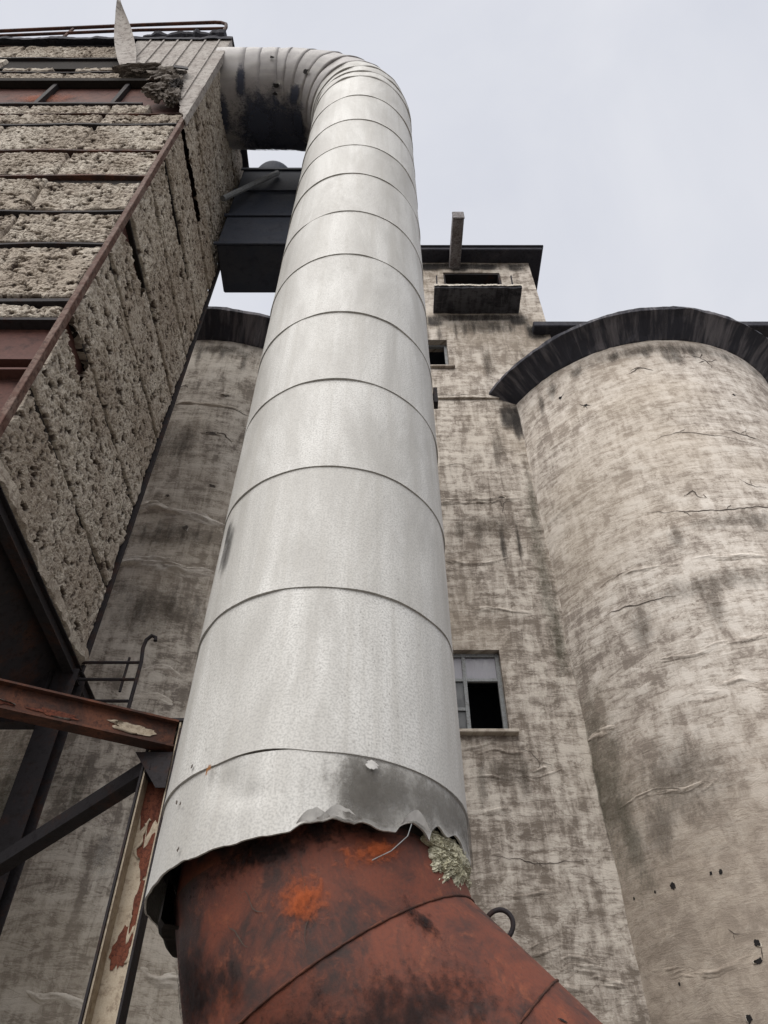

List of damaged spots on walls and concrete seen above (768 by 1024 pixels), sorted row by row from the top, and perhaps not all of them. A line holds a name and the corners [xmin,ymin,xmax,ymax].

damp [220,65,277,145]
damp [289,85,306,140]
damp [512,412,523,437]
crack [649,479,767,515]
crack [611,596,672,612]
peeling [108,720,156,736]
peeling [109,778,168,970]